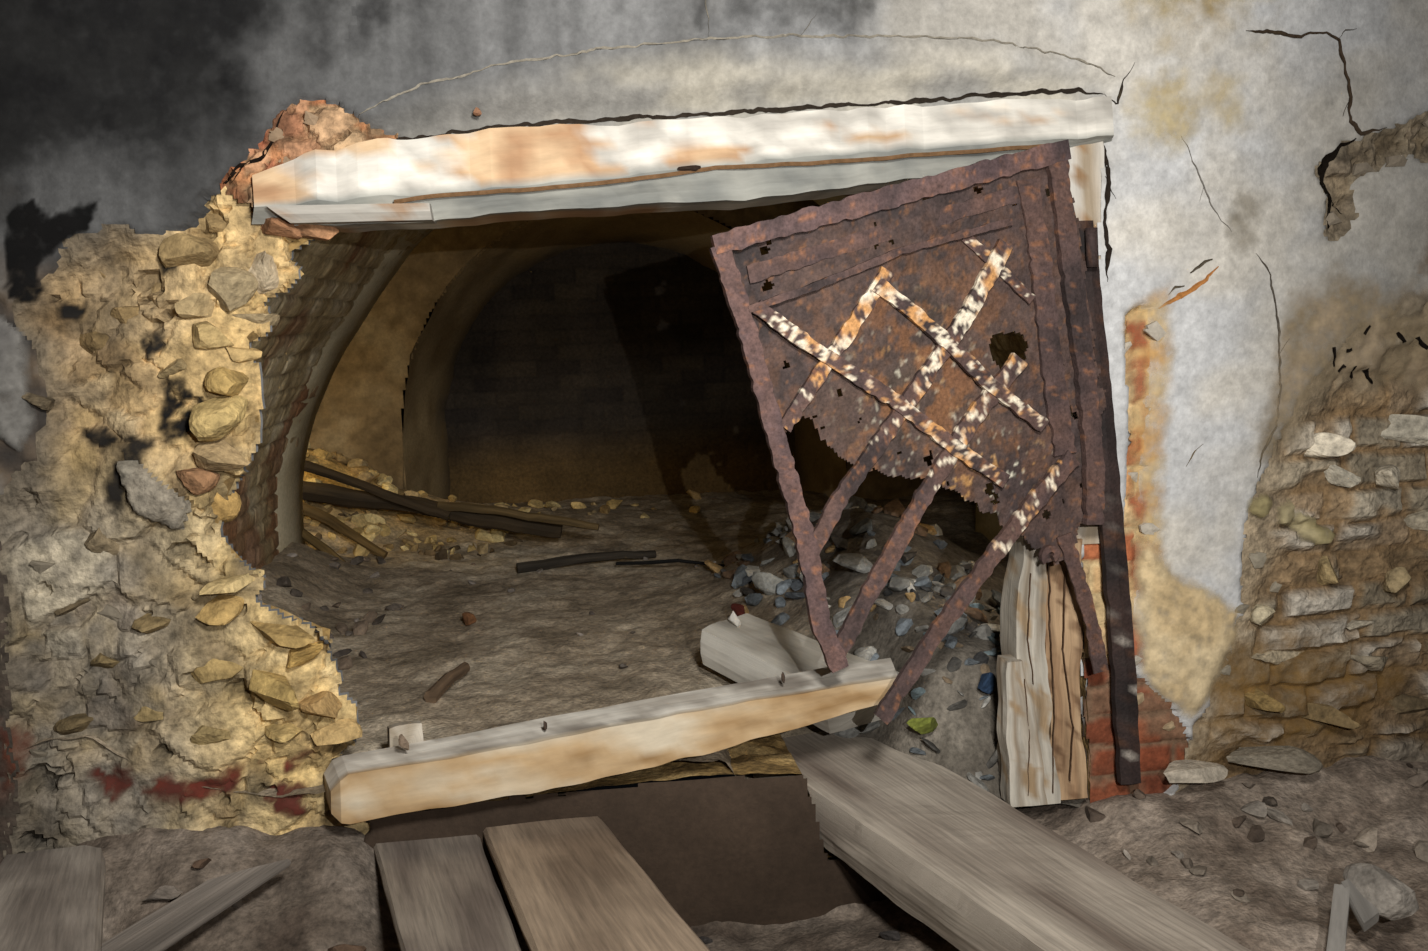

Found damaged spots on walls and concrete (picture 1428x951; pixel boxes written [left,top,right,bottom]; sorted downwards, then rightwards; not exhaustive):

crack [358,0,1135,140]
crack [1103,146,1116,282]
crack [1246,28,1387,230]
spalling [1315,111,1428,241]
spalling [0,99,398,864]
corrosion [1127,299,1168,553]
spalling [1081,259,1428,803]